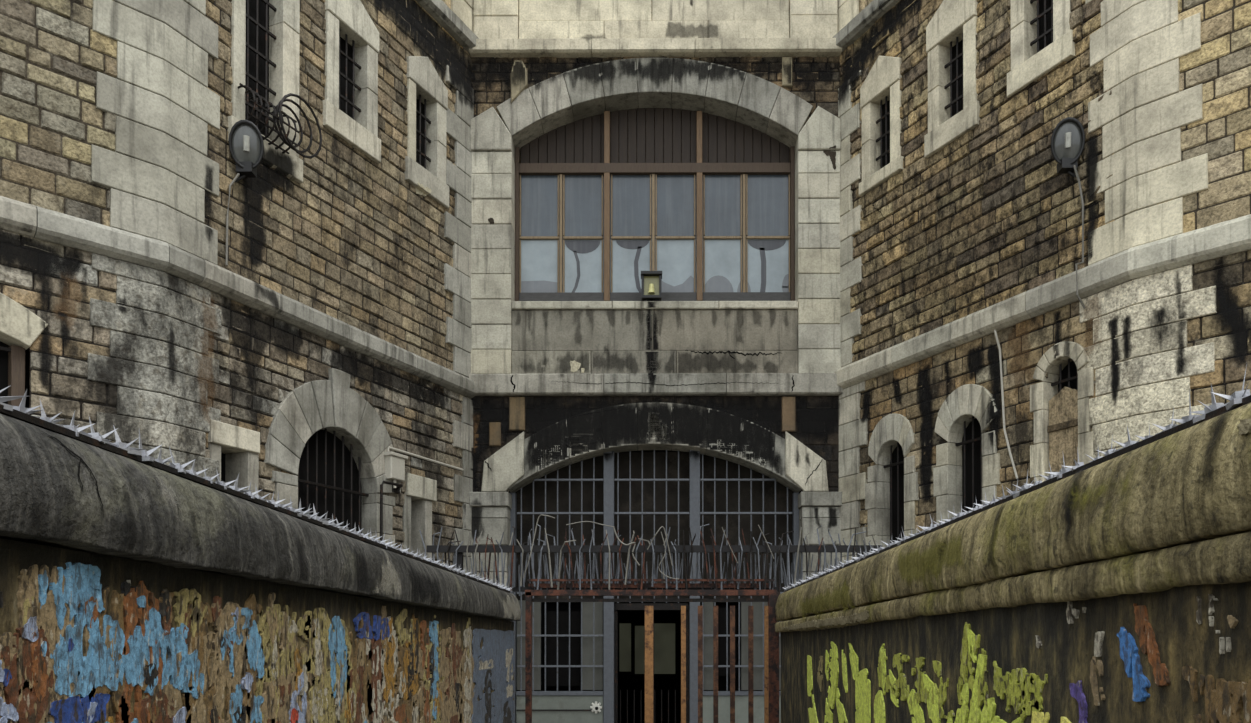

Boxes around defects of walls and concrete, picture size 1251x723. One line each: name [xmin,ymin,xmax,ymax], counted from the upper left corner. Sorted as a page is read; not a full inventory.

water stain [0,228,86,389]
water stain [646,302,658,392]
water stain [861,390,870,422]
water stain [893,378,902,404]
water stain [917,359,951,502]
water stain [967,345,1003,454]
water stain [1053,312,1069,359]
water stain [1109,316,1131,403]
water stain [1154,275,1185,375]
water stain [1215,261,1251,364]
water stain [814,507,837,527]
peeling [1196,594,1239,654]